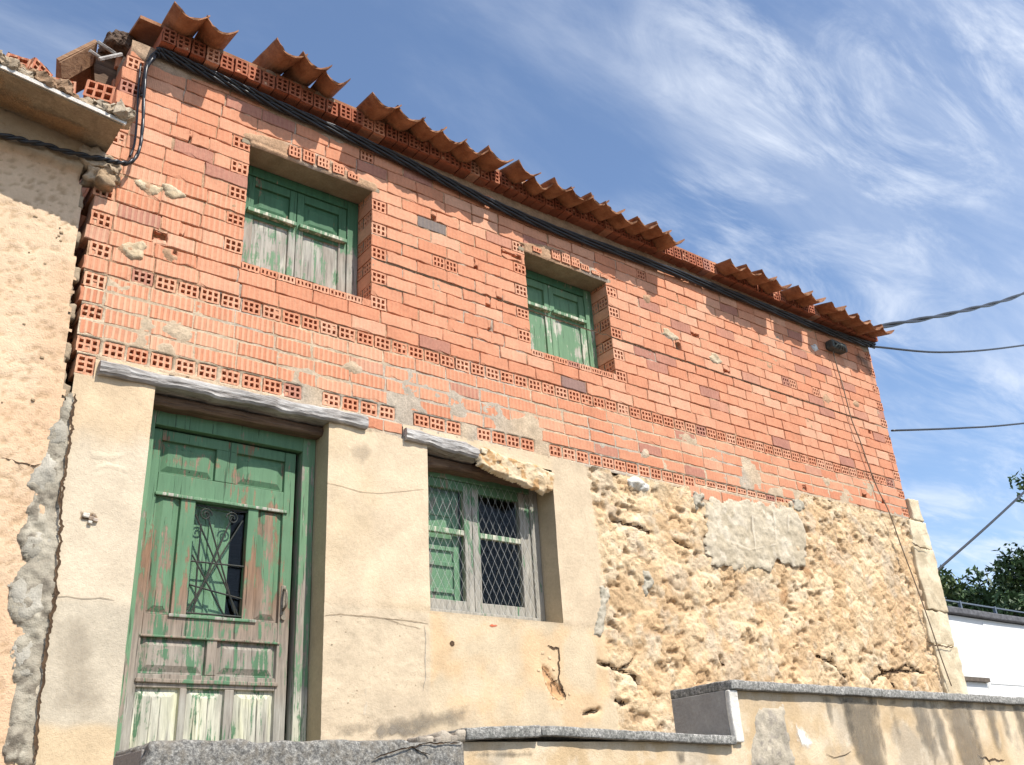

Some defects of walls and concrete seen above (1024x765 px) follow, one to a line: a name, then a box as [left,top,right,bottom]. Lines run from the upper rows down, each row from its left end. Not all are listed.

spalling [475,447,555,496]
crack [542,645,598,715]
crack [871,664,924,687]